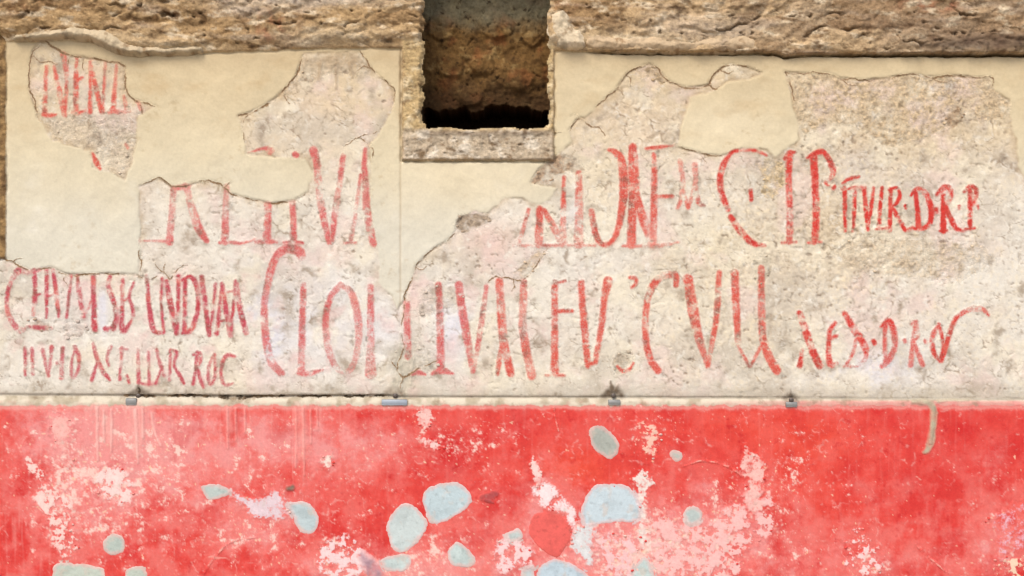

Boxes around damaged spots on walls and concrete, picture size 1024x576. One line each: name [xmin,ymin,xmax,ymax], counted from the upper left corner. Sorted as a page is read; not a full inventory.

flaking render [43,116,137,178]
flaking render [529,151,589,186]
flaking render [453,211,495,234]
crack [122,232,457,402]
peeling [409,402,448,457]
peeling [313,451,339,473]
peeling [13,409,141,565]
peeling [225,483,295,525]
peeling [525,416,783,576]
peeling [312,527,383,576]
peeling [488,533,541,576]